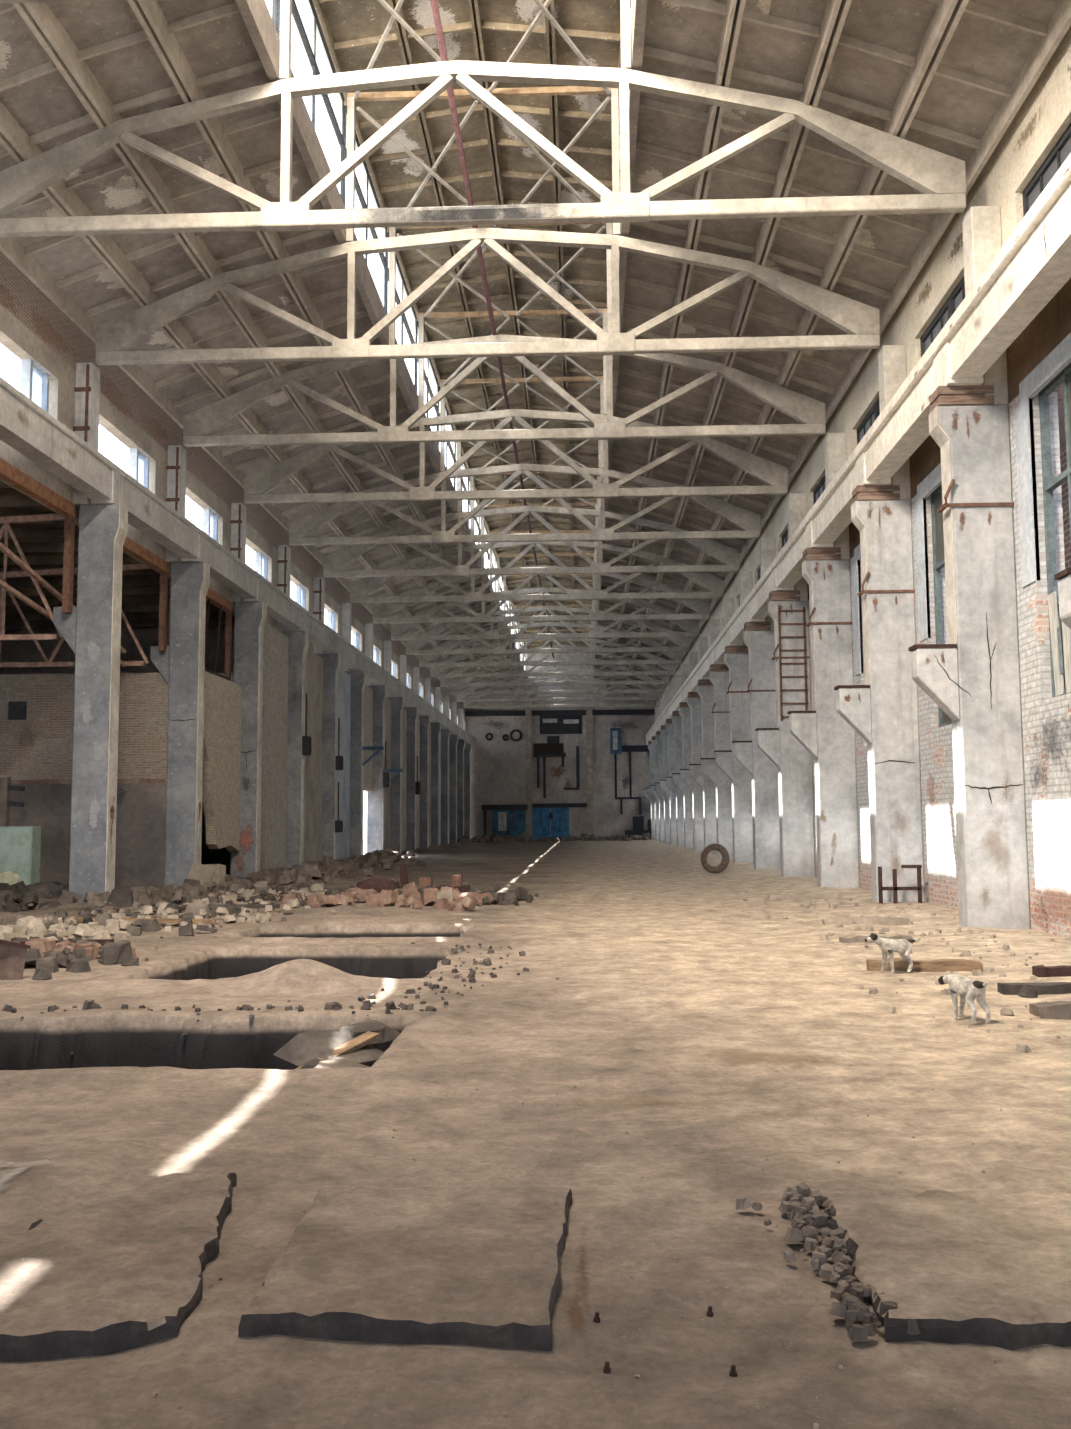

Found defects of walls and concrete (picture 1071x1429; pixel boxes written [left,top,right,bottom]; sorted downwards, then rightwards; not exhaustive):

peeling [0,35,13,77]
peeling [99,175,148,210]
corrosion [952,412,980,437]